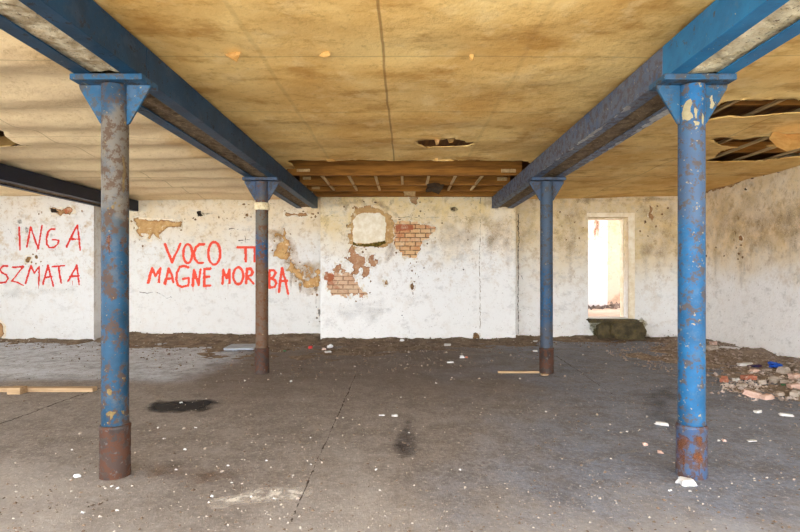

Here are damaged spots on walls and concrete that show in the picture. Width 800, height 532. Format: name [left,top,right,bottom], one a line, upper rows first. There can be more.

peeling [681,96,715,125]
spalling [38,205,83,216]
peeling [131,209,206,247]
peeling [271,197,443,296]
crack [290,375,356,522]
corrosion [677,435,703,474]